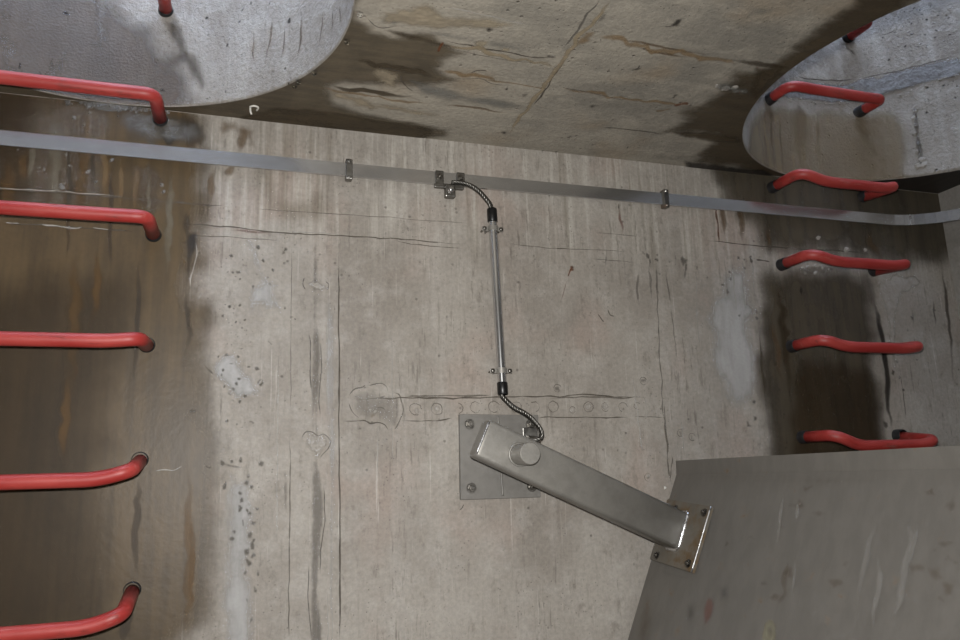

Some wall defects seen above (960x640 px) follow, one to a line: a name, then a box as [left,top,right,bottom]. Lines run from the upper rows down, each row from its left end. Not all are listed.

leakage [0,0,493,149]
crack [452,42,625,104]
crack [567,5,596,43]
leakage [675,0,960,260]
crack [0,187,453,248]
leakage [0,146,241,640]
leakage [713,256,919,455]